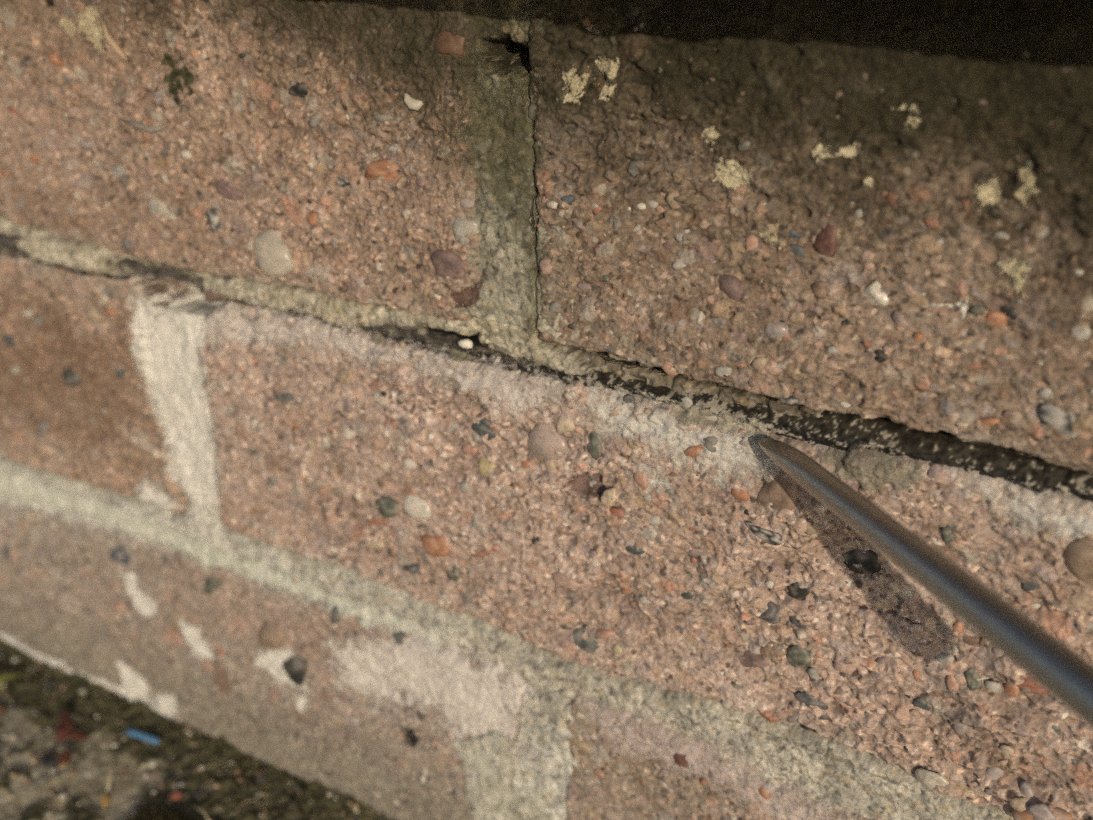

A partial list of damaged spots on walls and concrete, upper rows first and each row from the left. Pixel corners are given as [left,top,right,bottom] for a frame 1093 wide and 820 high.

crack [528,124,540,290]
crack [207,299,352,333]
crack [383,336,569,385]
crack [577,347,738,389]
crack [927,435,1093,475]